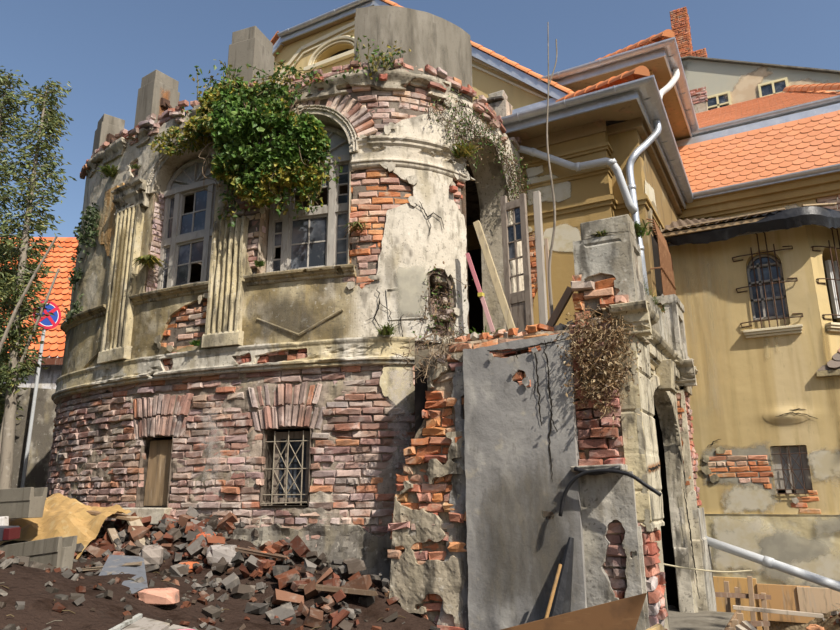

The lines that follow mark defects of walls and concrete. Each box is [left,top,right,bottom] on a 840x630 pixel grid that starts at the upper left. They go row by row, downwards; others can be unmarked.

flaking render [724,67,771,105]
spalling [342,161,418,290]
crack [415,201,444,236]
spalling [154,293,208,371]
crack [487,336,574,482]
spalling [437,366,469,630]
spalling [701,445,776,513]
spalling [791,490,821,514]
peeling [809,451,840,480]